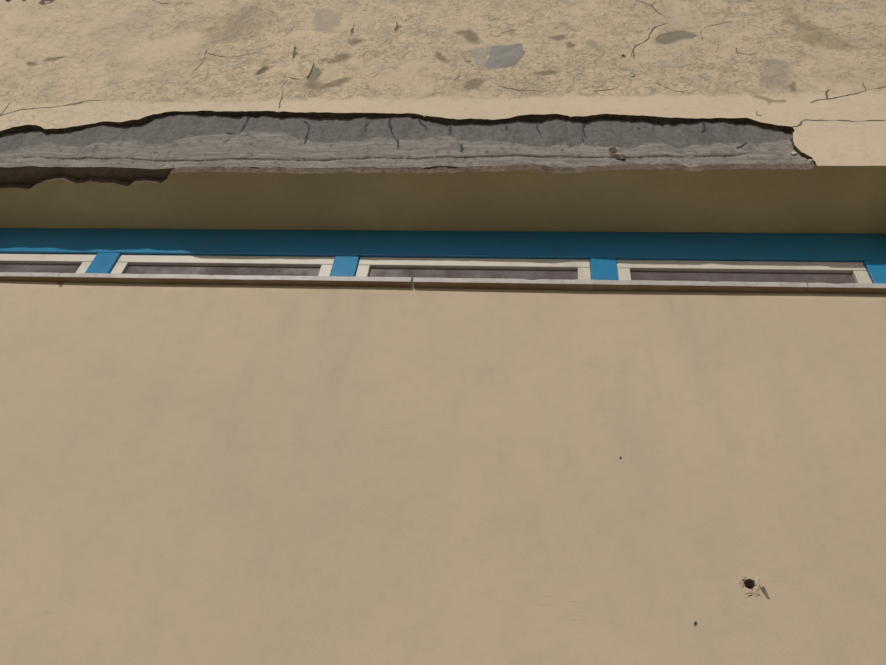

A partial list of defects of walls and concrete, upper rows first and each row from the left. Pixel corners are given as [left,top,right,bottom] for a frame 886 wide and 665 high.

flaking render [455,29,478,42]
crack [631,0,668,57]
flaking render [656,31,697,44]
peeling [485,44,526,69]
flaking render [449,68,483,90]
crack [0,98,132,115]
crack [792,82,886,127]
spalling [0,111,817,189]
flaking render [738,576,770,599]